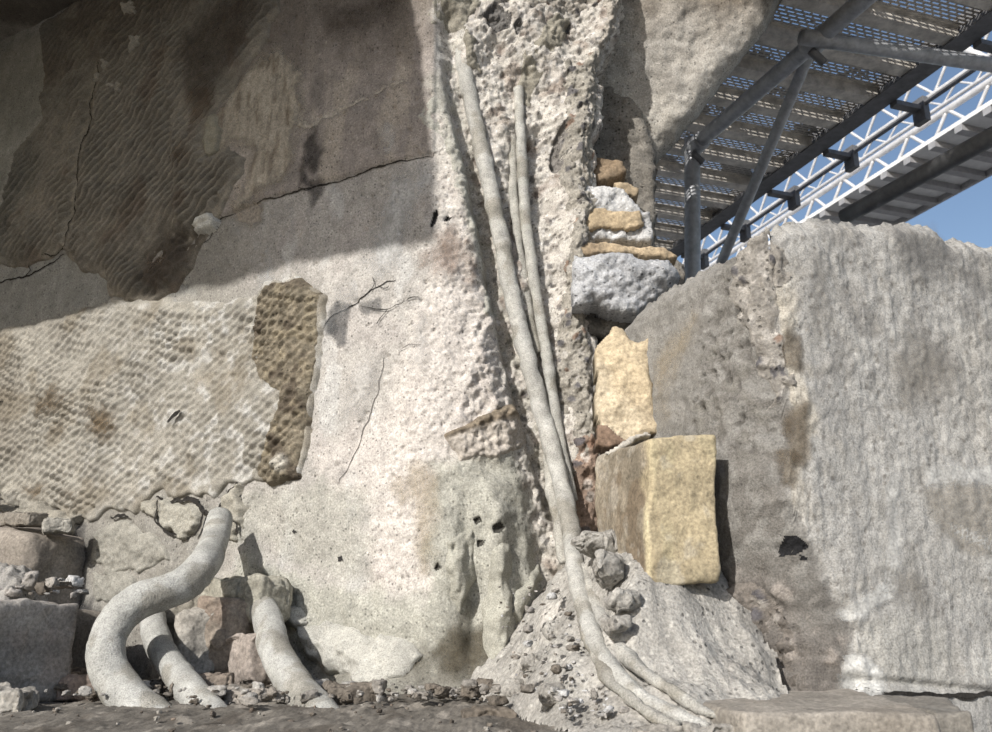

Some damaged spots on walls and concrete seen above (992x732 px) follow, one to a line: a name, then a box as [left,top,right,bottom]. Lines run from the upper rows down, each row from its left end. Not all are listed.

crack [0,63,99,283]
crack [204,156,430,243]
crack [325,277,416,324]
crack [339,344,421,481]